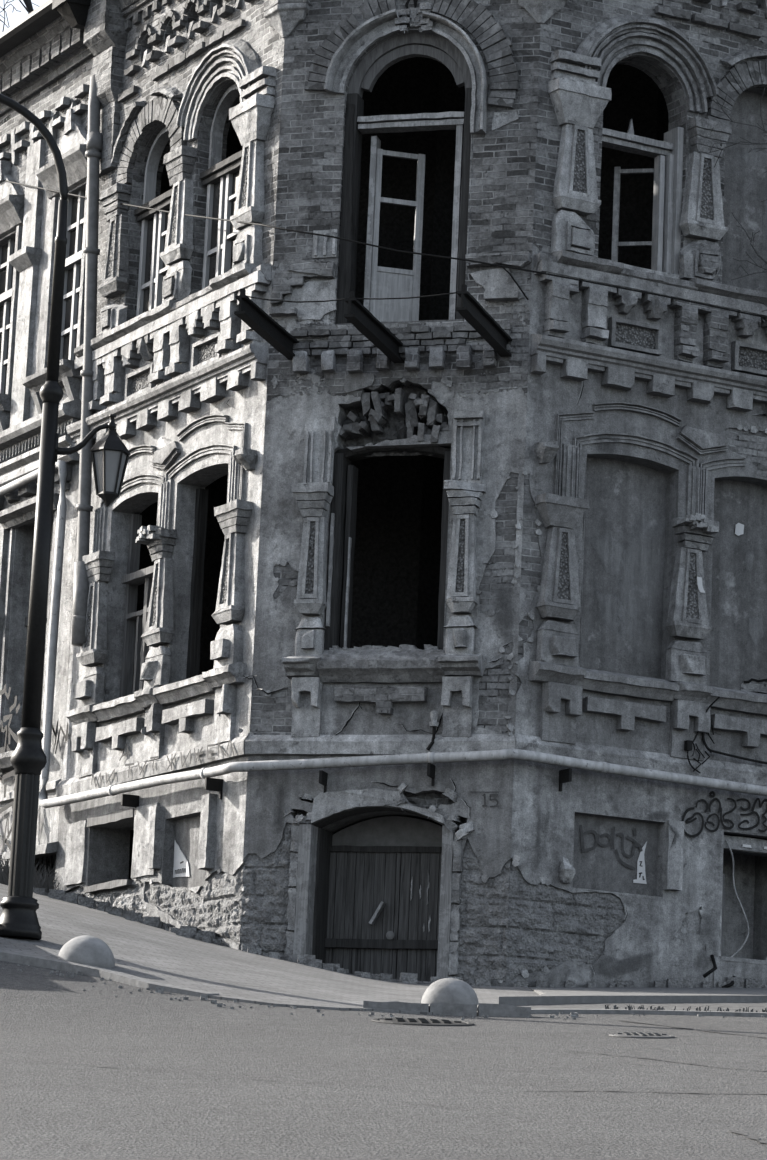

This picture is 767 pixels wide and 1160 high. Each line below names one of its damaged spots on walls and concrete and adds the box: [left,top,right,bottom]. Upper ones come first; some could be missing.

flaking render [431,376,455,405]
flaking render [476,471,542,736]
spalling [61,793,314,960]
spalling [393,783,625,984]